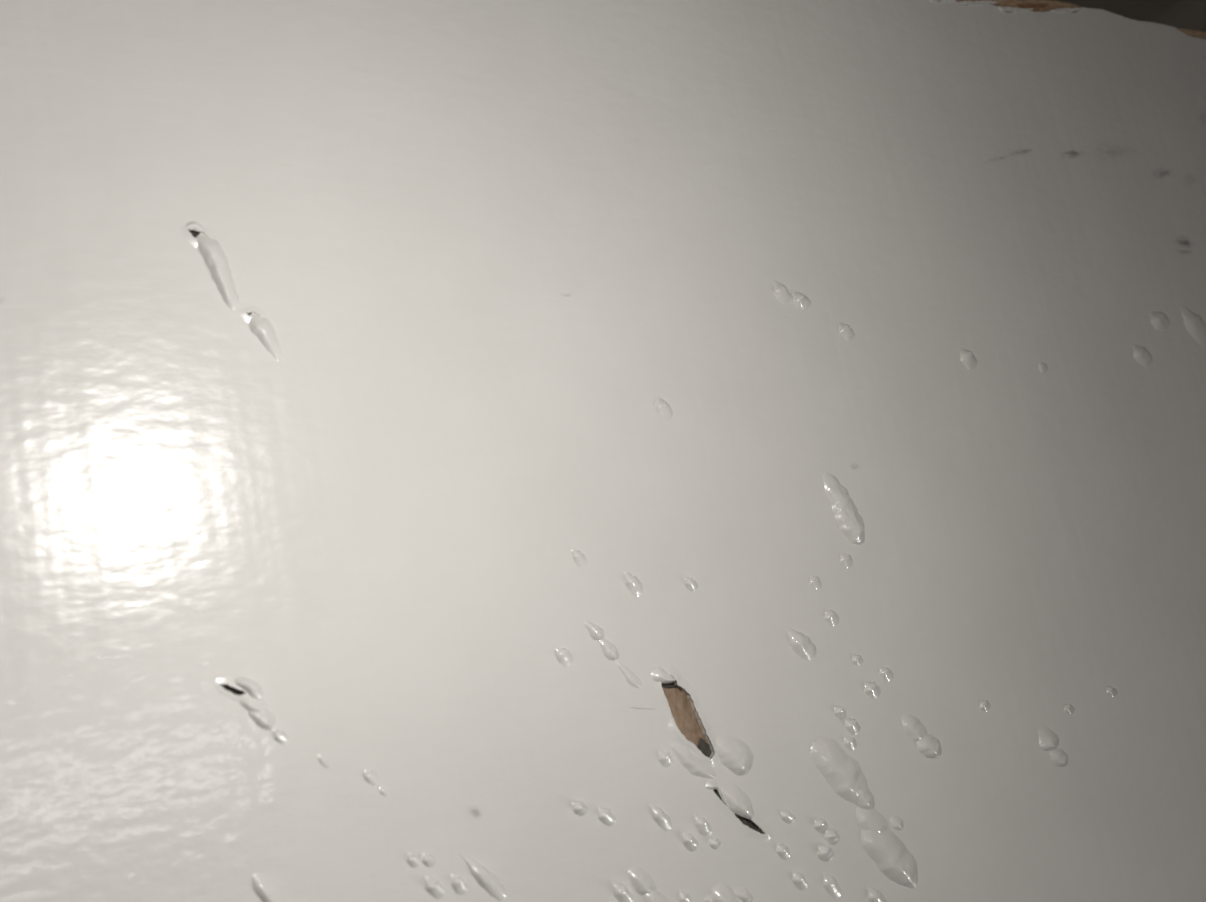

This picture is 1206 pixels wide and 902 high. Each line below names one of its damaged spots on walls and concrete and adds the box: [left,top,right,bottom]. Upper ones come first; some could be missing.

peeling [628,666,773,842]